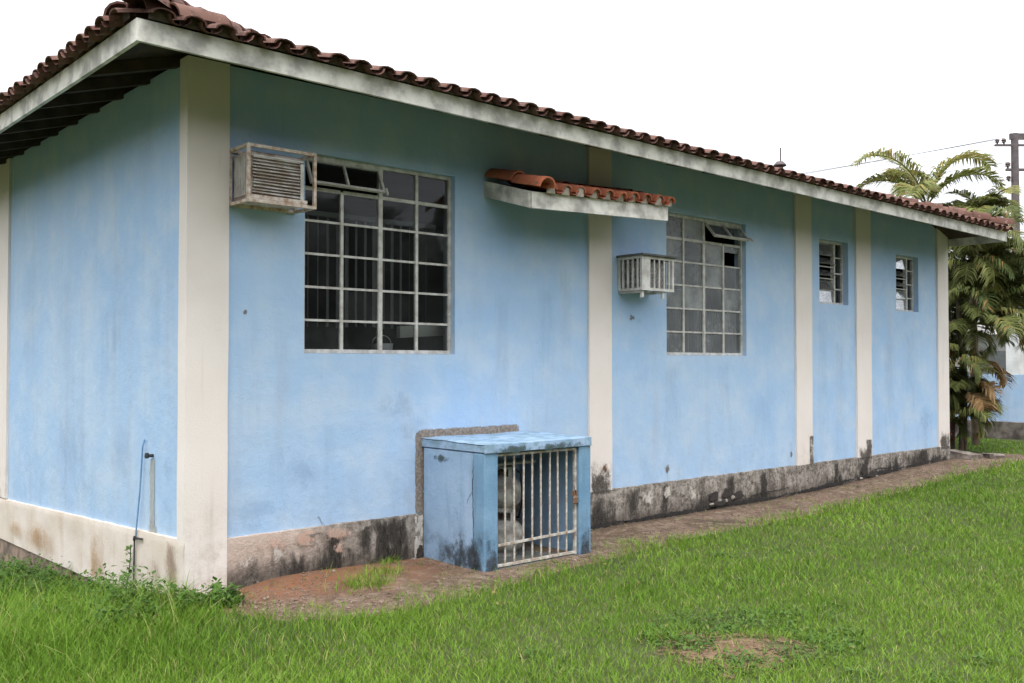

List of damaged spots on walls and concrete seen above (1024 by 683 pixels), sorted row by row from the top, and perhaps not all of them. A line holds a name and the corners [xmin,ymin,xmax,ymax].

damp [827,440,872,487]
damp [886,450,941,473]
damp [592,469,616,529]
damp [629,490,639,519]
damp [691,498,710,513]
damp [728,472,770,504]
damp [280,518,408,577]